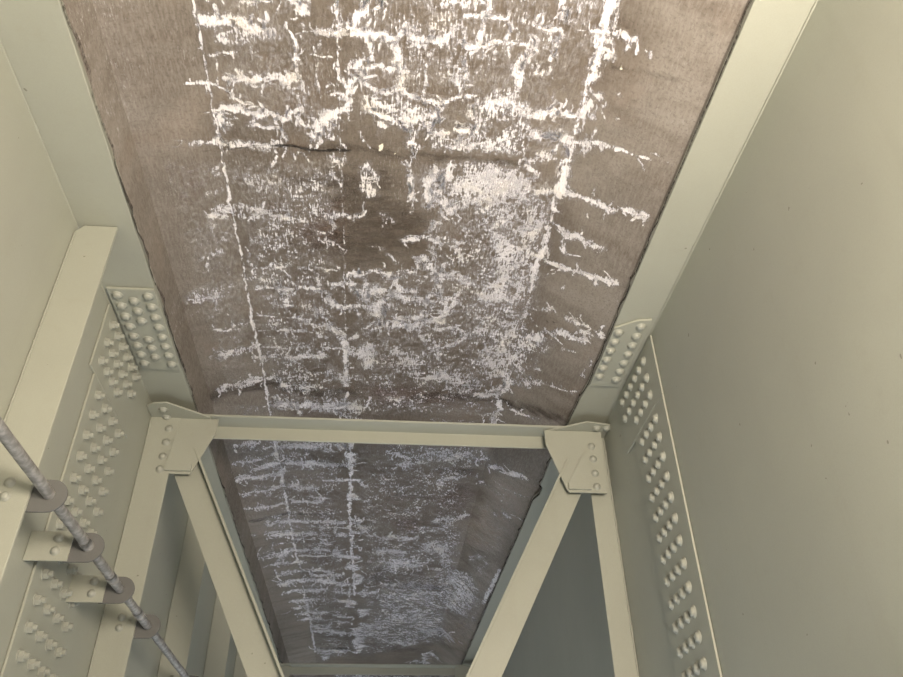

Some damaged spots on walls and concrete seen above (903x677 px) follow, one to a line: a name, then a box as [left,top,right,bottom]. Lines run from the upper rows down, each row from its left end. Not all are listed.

crack [61,3,198,412]
damp [188,285,241,341]
damp [234,0,561,423]
crack [181,0,752,426]
damp [242,441,490,657]
crack [217,440,551,665]